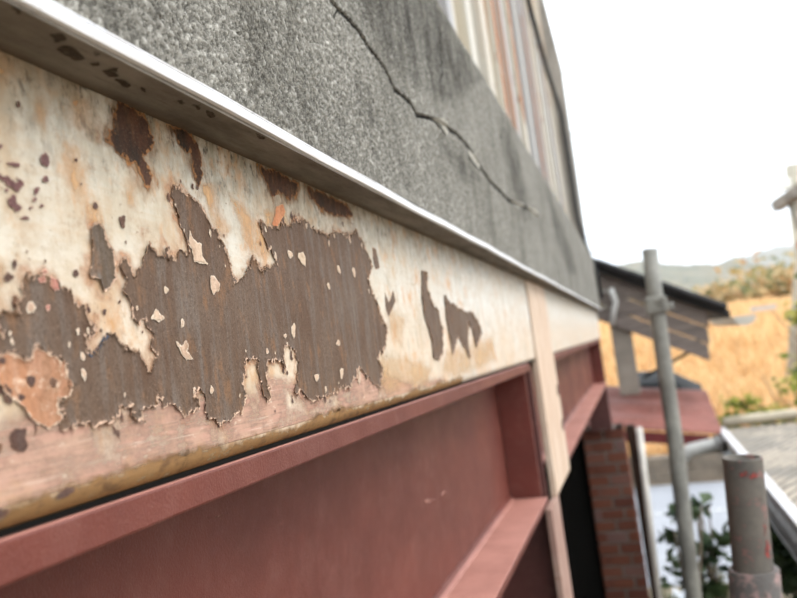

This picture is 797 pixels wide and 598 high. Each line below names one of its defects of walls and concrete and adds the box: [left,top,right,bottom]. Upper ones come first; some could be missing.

crack [329,0,470,150]
spalling [0,173,24,193]
rust [5,152,50,220]
rust [97,100,159,189]
rust [166,123,213,212]
rust [256,163,353,227]
crack [479,166,536,216]
peeling [0,179,445,518]
peeling [422,270,482,361]